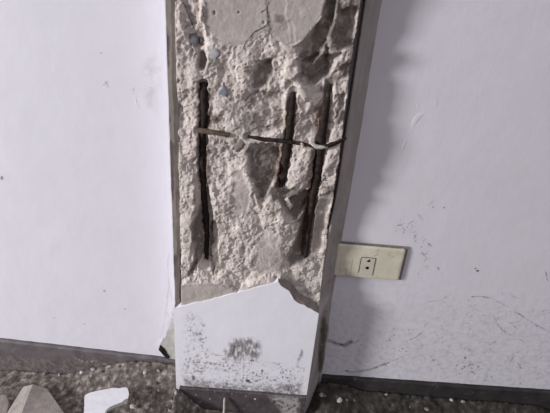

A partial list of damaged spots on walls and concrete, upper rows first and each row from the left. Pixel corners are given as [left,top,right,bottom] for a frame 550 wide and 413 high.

spalling [175,0,361,313]